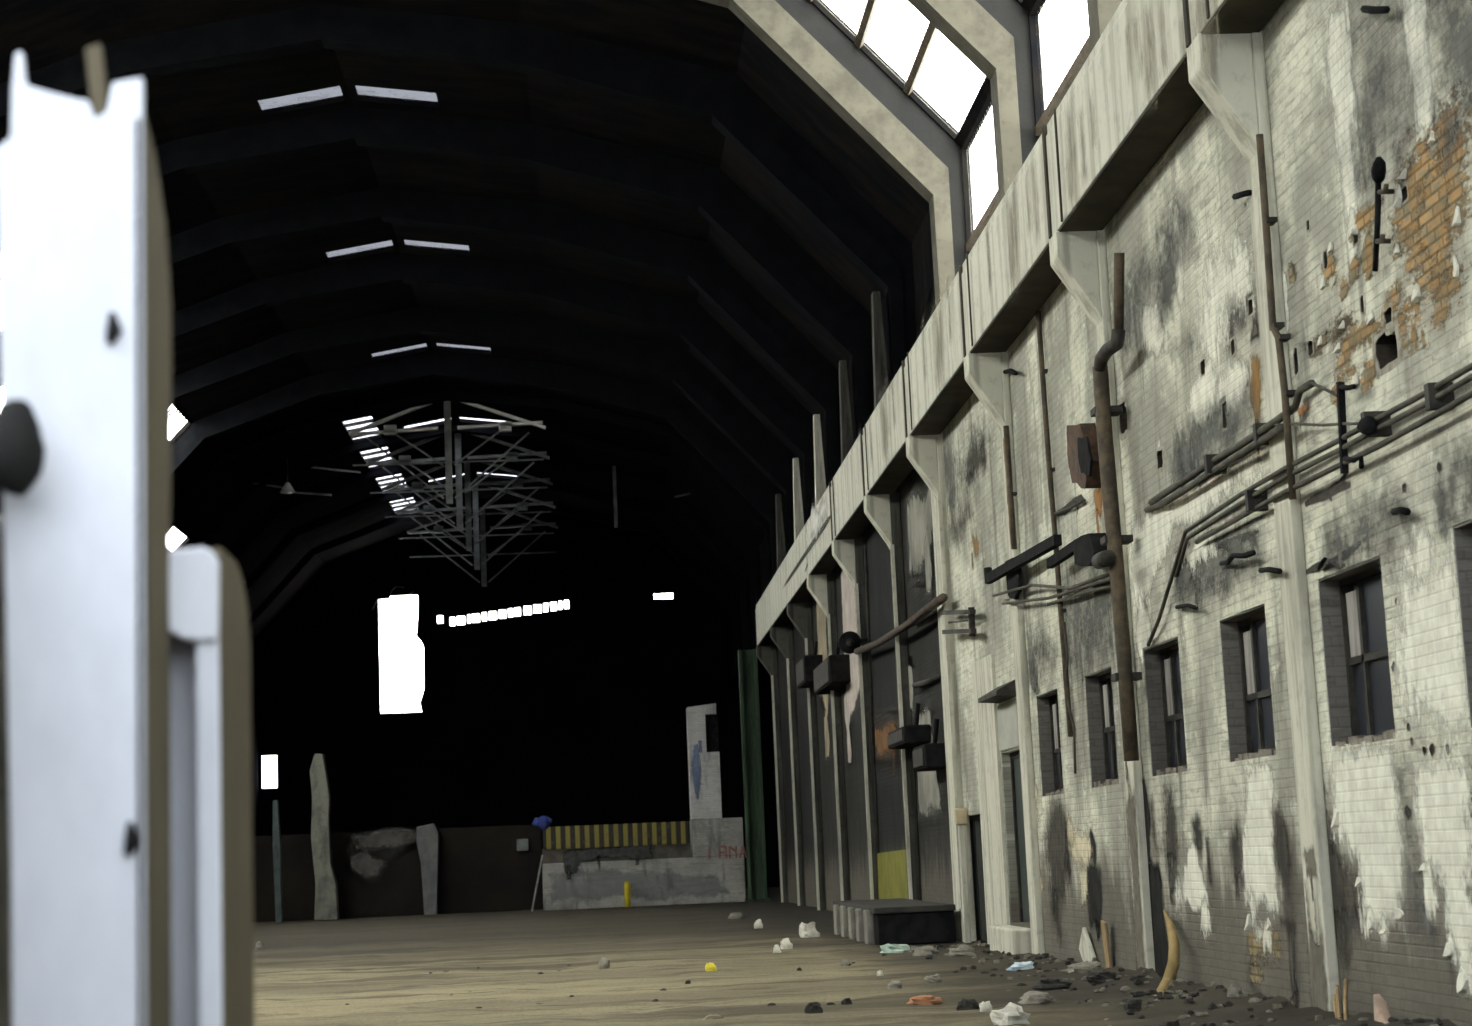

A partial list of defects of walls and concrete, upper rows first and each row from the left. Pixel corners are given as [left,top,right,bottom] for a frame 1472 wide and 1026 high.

water stain [1160,258,1175,322]
water stain [1251,315,1259,343]
spalling [1288,262,1296,283]
spalling [1293,86,1472,406]
rust [1094,488,1102,533]
rust [874,721,899,775]
peeling [1330,523,1472,995]
water stain [1044,797,1102,939]
peeling [1176,842,1211,938]
peeling [1242,761,1282,985]